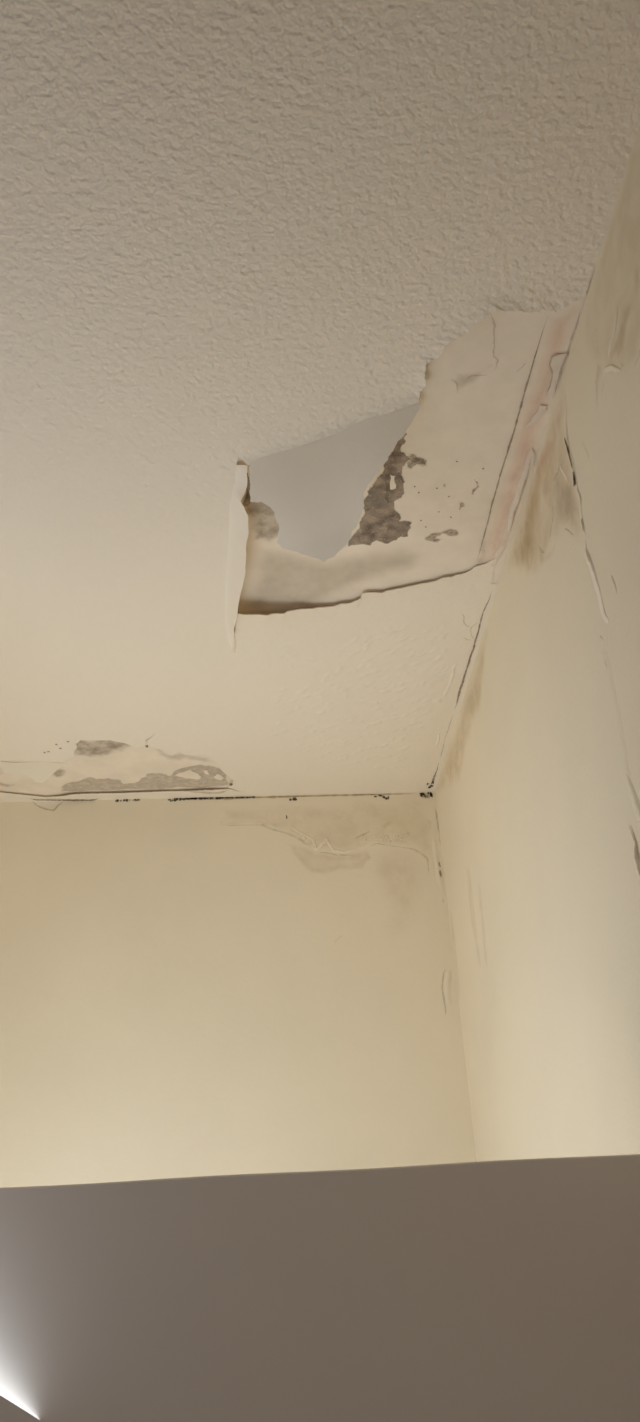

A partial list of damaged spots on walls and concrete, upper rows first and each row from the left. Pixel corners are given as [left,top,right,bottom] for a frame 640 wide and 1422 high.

peeling [225,268,617,654]